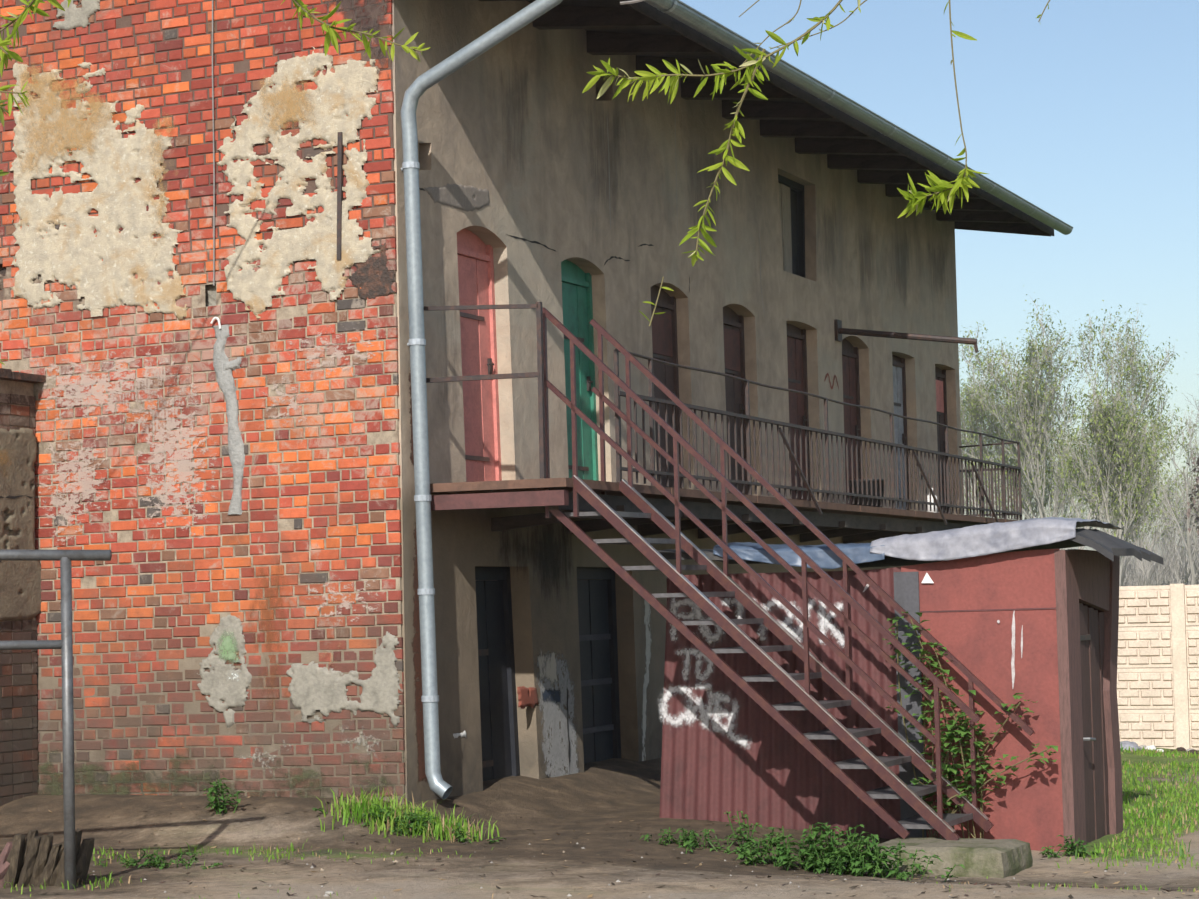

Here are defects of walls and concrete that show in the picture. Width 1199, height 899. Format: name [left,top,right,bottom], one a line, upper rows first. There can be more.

flaking render [9,62,189,321]
flaking render [214,47,395,318]
crack [507,234,557,252]
peeling [223,708,235,728]
peeling [517,650,579,777]